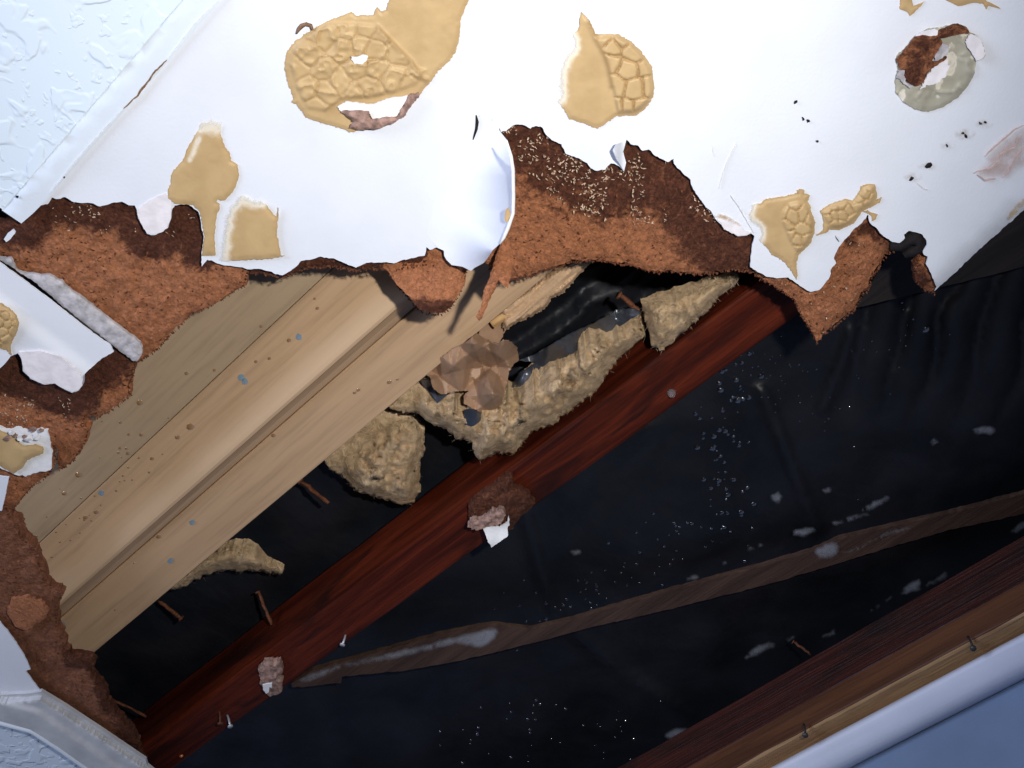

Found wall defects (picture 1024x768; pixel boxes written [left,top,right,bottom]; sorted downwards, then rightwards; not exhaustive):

spalling [0,114,936,759]